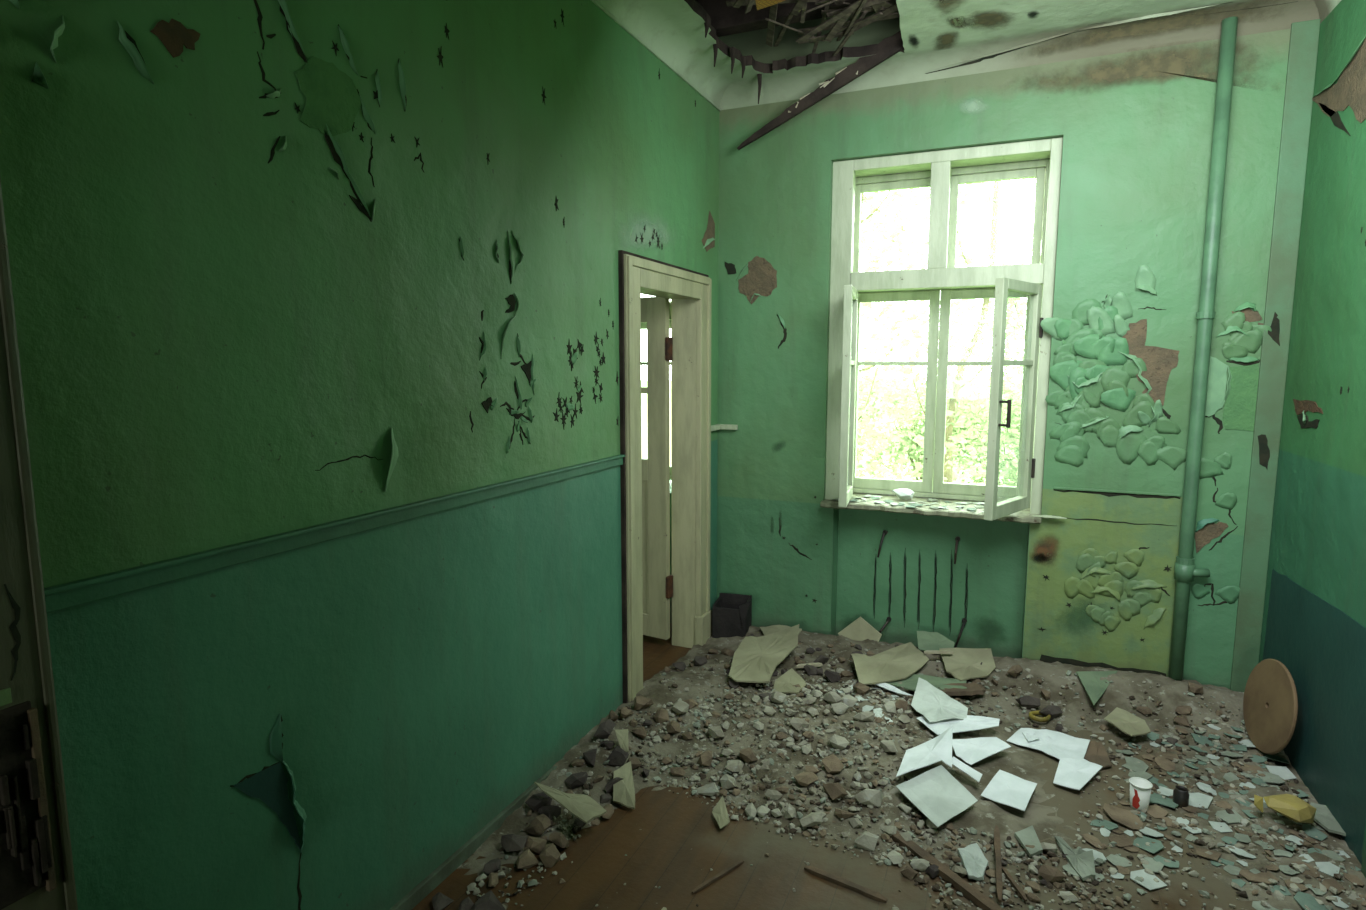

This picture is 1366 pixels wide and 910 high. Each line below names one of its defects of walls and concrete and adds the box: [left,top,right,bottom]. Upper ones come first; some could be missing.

peeling [32,15,65,89]
flaking render [150,19,200,58]
damp [937,0,1009,49]
flaking render [1312,35,1366,136]
flaking render [702,211,716,252]
flaking render [725,256,777,304]
peeling [469,230,537,454]
flaking render [1040,264,1238,553]